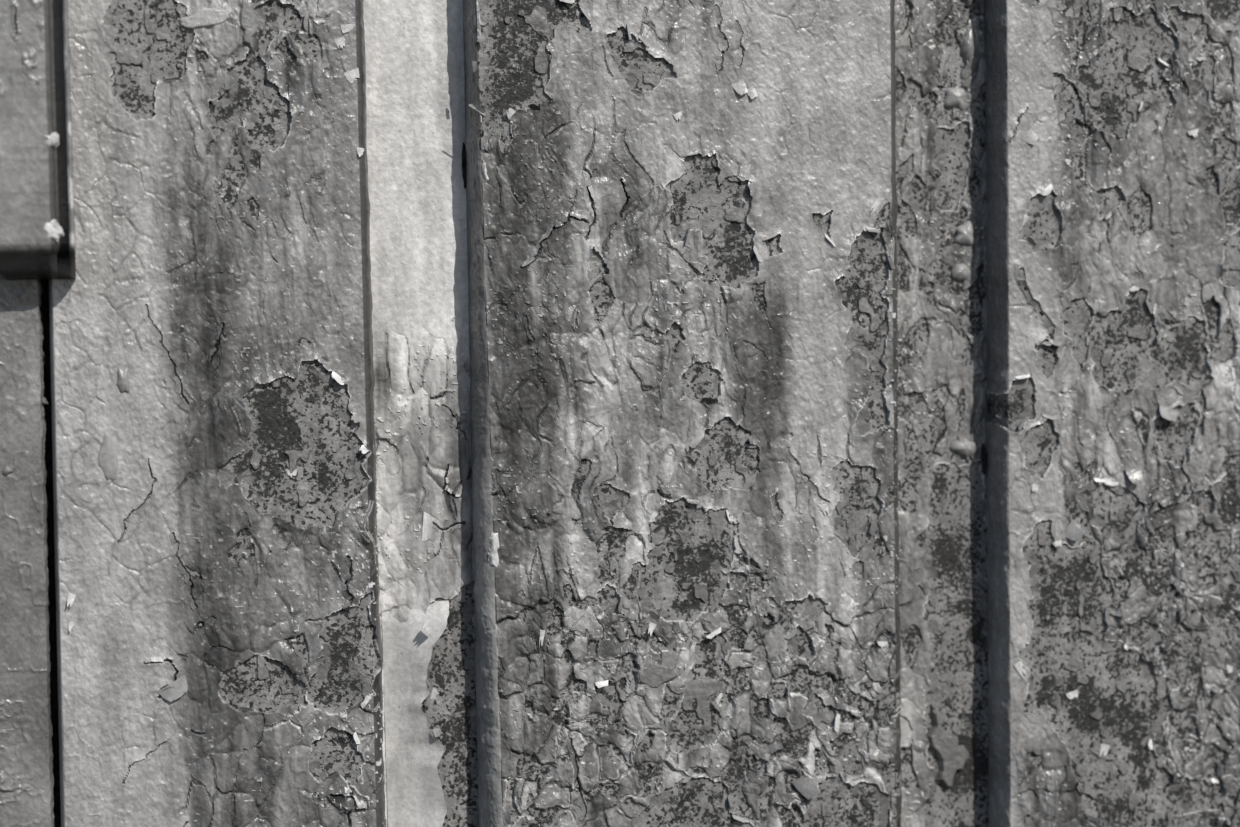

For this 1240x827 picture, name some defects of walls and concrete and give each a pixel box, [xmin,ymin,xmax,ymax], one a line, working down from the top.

crack [119,459,158,541]
crack [143,656,183,697]
peeling [218,360,369,527]
crack [330,794,355,823]
crack [341,556,352,609]
peeling [218,582,479,827]
crack [566,739,586,821]
peeling [595,417,783,827]
crack [784,448,826,501]
peeling [921,460,989,827]
peeling [987,286,1212,478]
peeling [1019,478,1229,827]